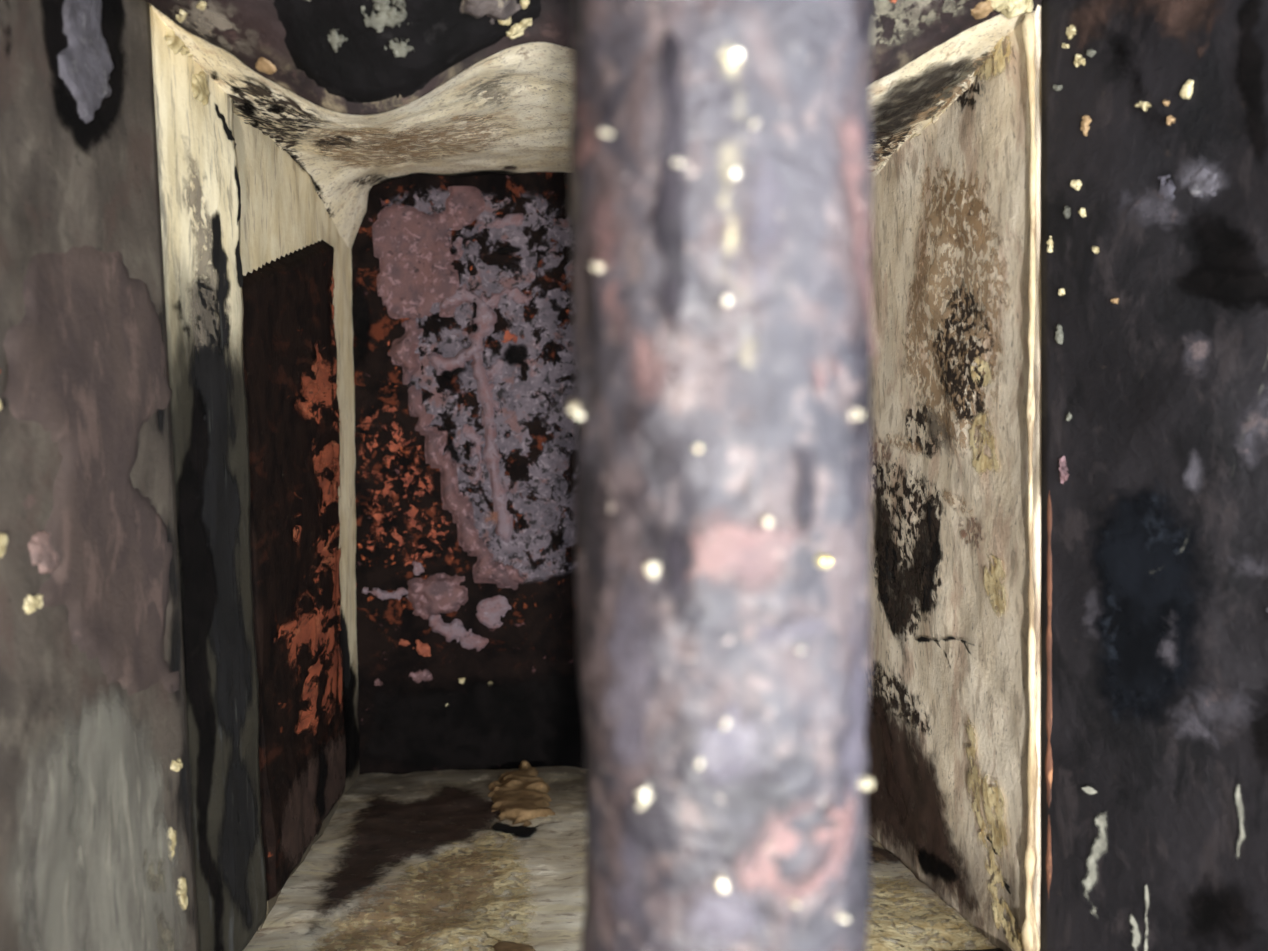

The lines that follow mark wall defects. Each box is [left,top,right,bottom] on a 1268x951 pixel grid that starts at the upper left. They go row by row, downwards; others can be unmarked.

peeling [41,0,125,153]
peeling [328,29,348,53]
peeling [361,0,415,58]
rust [297,269,341,516]
rust [358,405,453,566]
rust [566,0,993,951]
damp [920,500,943,613]
rust [274,519,343,734]
peeling [429,595,511,652]
damp [1083,814,1107,895]
damp [1235,785,1245,857]
damp [1130,885,1149,951]